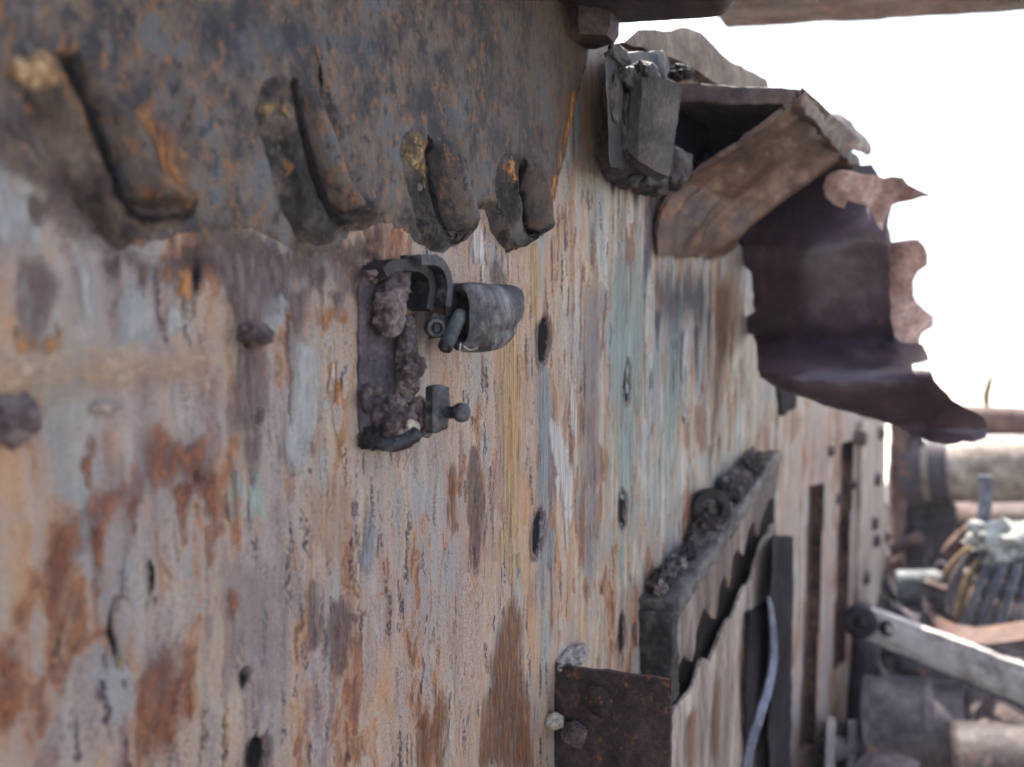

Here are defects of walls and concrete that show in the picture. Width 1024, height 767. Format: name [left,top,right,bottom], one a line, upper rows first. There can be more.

rust [0,122,148,286]
peeling [328,360,349,436]
peeling [406,419,421,430]
rust [47,425,218,619]
rust [0,637,24,731]
peeling [402,676,453,767]
peeling [478,596,537,767]